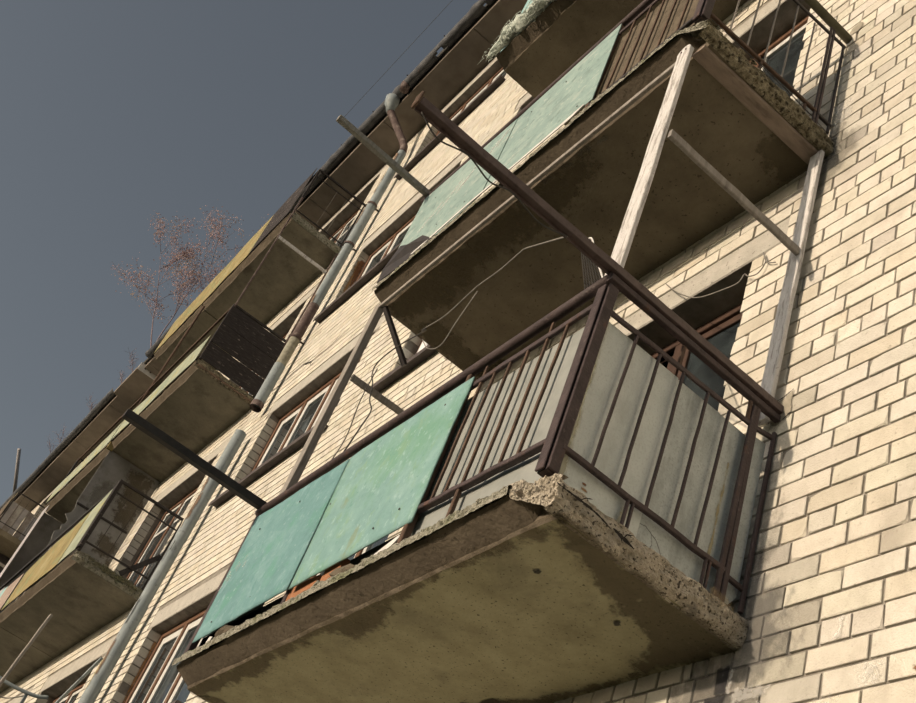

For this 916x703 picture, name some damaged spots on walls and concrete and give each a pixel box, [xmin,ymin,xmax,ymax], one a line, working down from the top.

spalling [512,20,835,174]
spalling [172,473,749,665]
water stain [188,513,735,703]